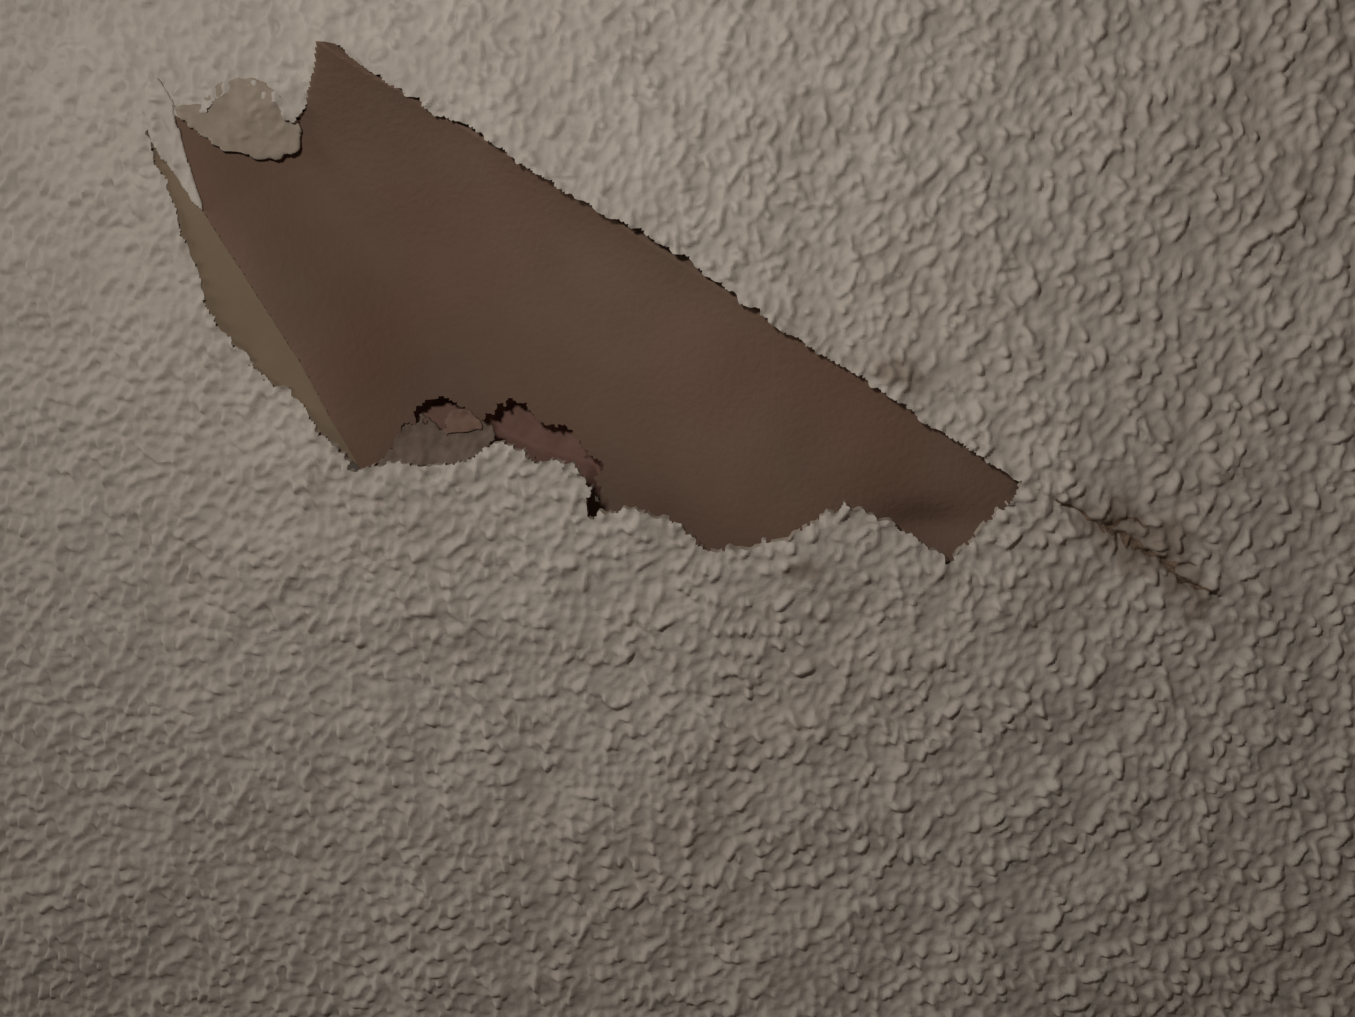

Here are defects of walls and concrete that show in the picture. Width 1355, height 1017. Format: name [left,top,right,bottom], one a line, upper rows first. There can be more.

peeling [141,41,1022,565]
crack [1055,499,1220,596]